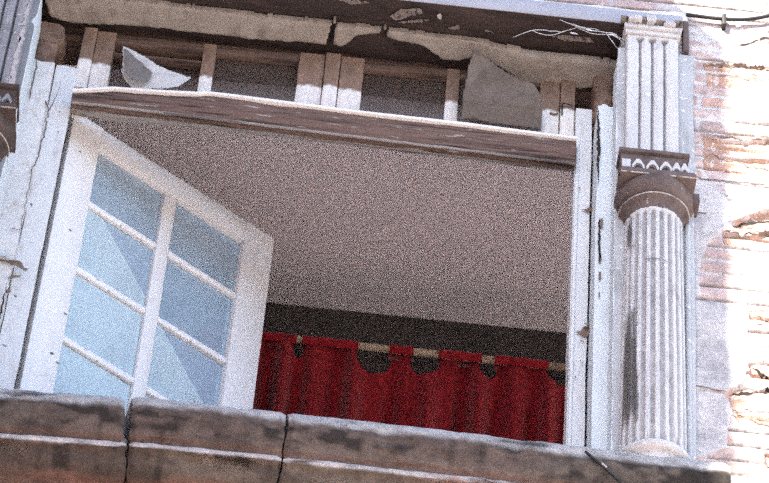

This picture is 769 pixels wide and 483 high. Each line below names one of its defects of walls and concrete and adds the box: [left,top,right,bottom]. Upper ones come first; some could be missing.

peeling [390,8,429,23]
peeling [552,35,593,43]
crack [12,55,60,245]
flaking render [703,191,769,248]
spalling [749,309,769,325]
spalling [729,363,769,430]